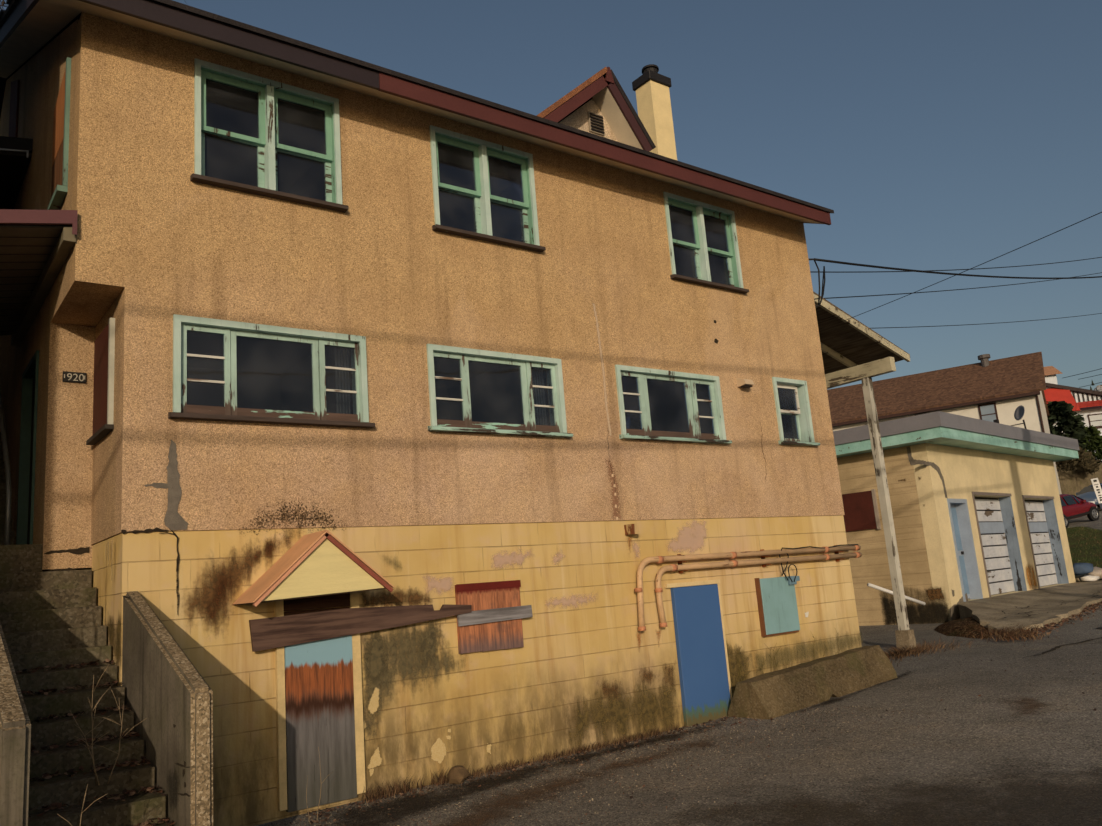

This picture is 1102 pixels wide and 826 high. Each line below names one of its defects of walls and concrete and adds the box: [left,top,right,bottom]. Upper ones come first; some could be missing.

crack [121,527,180,615]
mould [187,499,347,629]
peeling [363,687,380,729]
peeling [367,747,382,777]
leakage [363,621,455,733]
peeling [431,729,451,764]